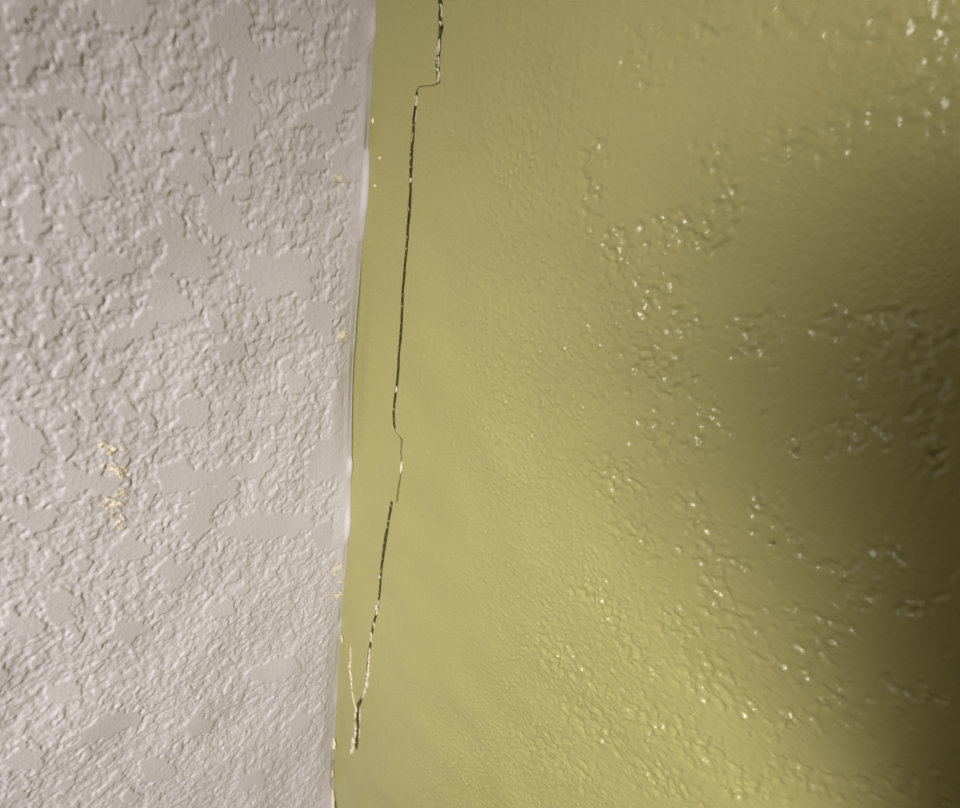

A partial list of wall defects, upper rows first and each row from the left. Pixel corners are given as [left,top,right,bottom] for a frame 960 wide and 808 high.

crack [348,0,443,754]